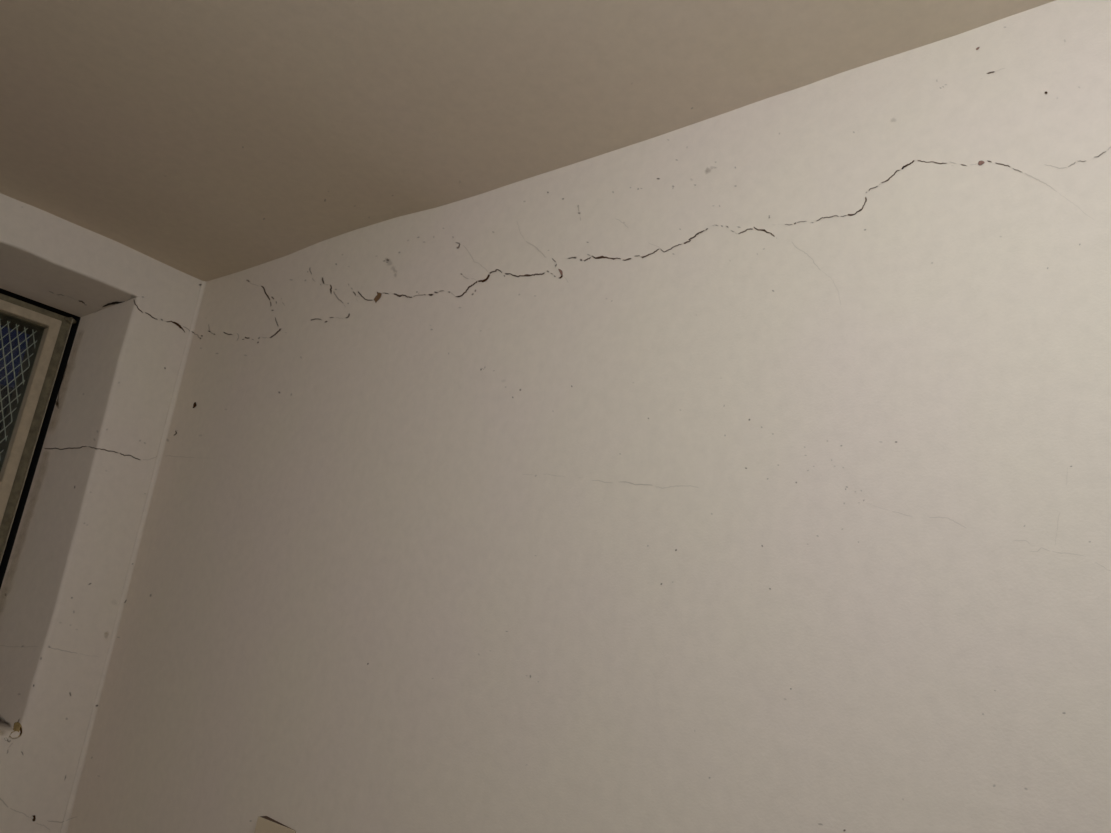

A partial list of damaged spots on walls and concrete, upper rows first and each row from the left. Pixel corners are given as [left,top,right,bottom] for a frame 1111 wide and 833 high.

crack [310,160,1021,322]
crack [79,286,281,343]
crack [45,446,140,460]